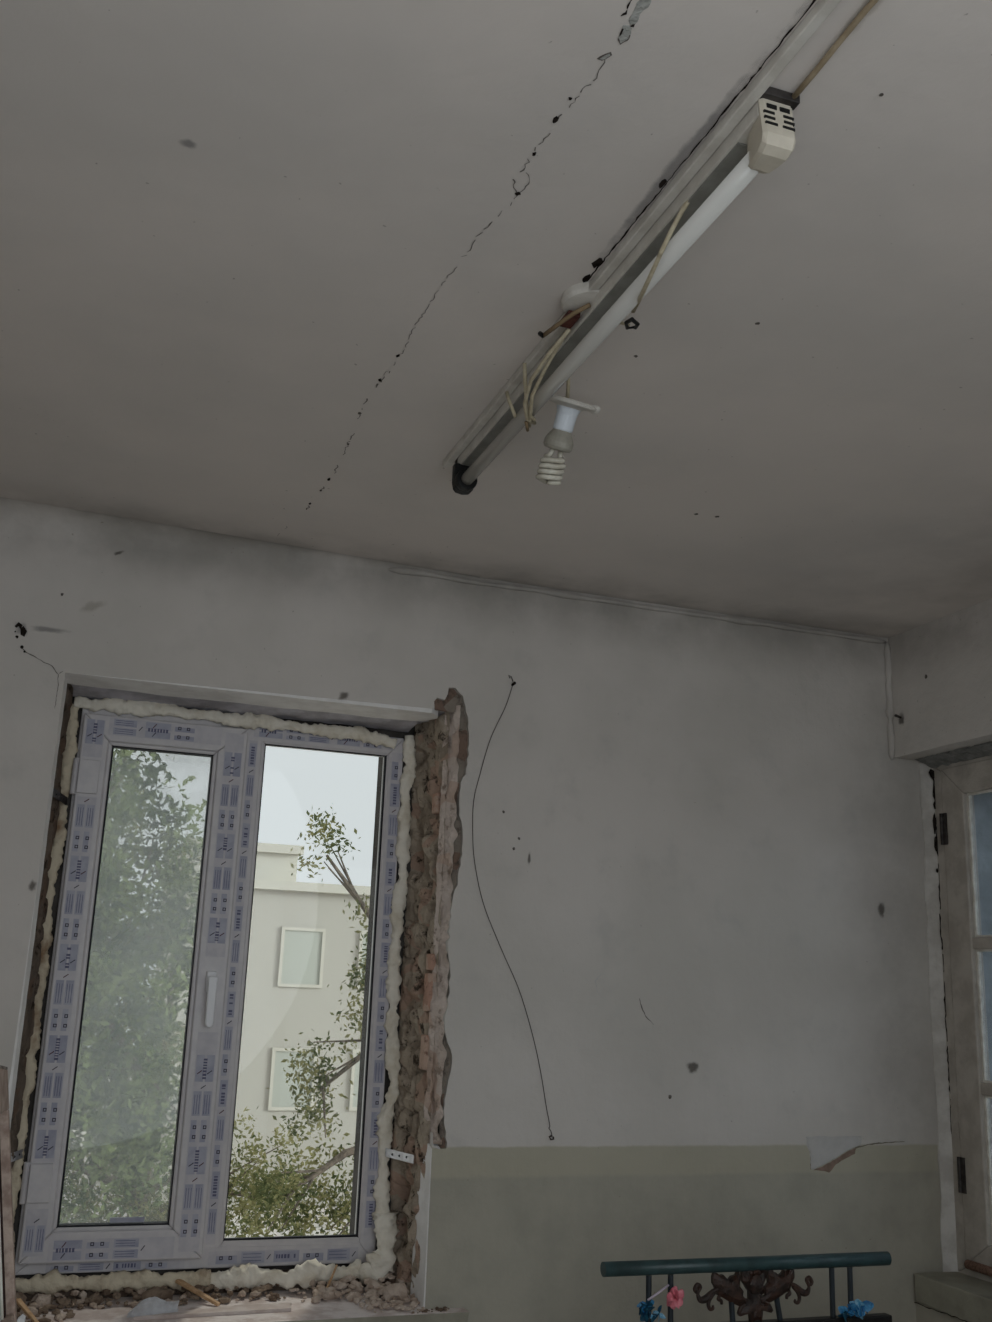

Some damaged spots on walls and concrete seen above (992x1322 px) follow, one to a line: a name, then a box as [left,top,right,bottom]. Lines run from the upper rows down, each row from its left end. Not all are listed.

flaking render [597,0,651,61]
crack [278,60,605,535]
flaking render [10,622,468,1296]
peeling [806,1136,905,1172]